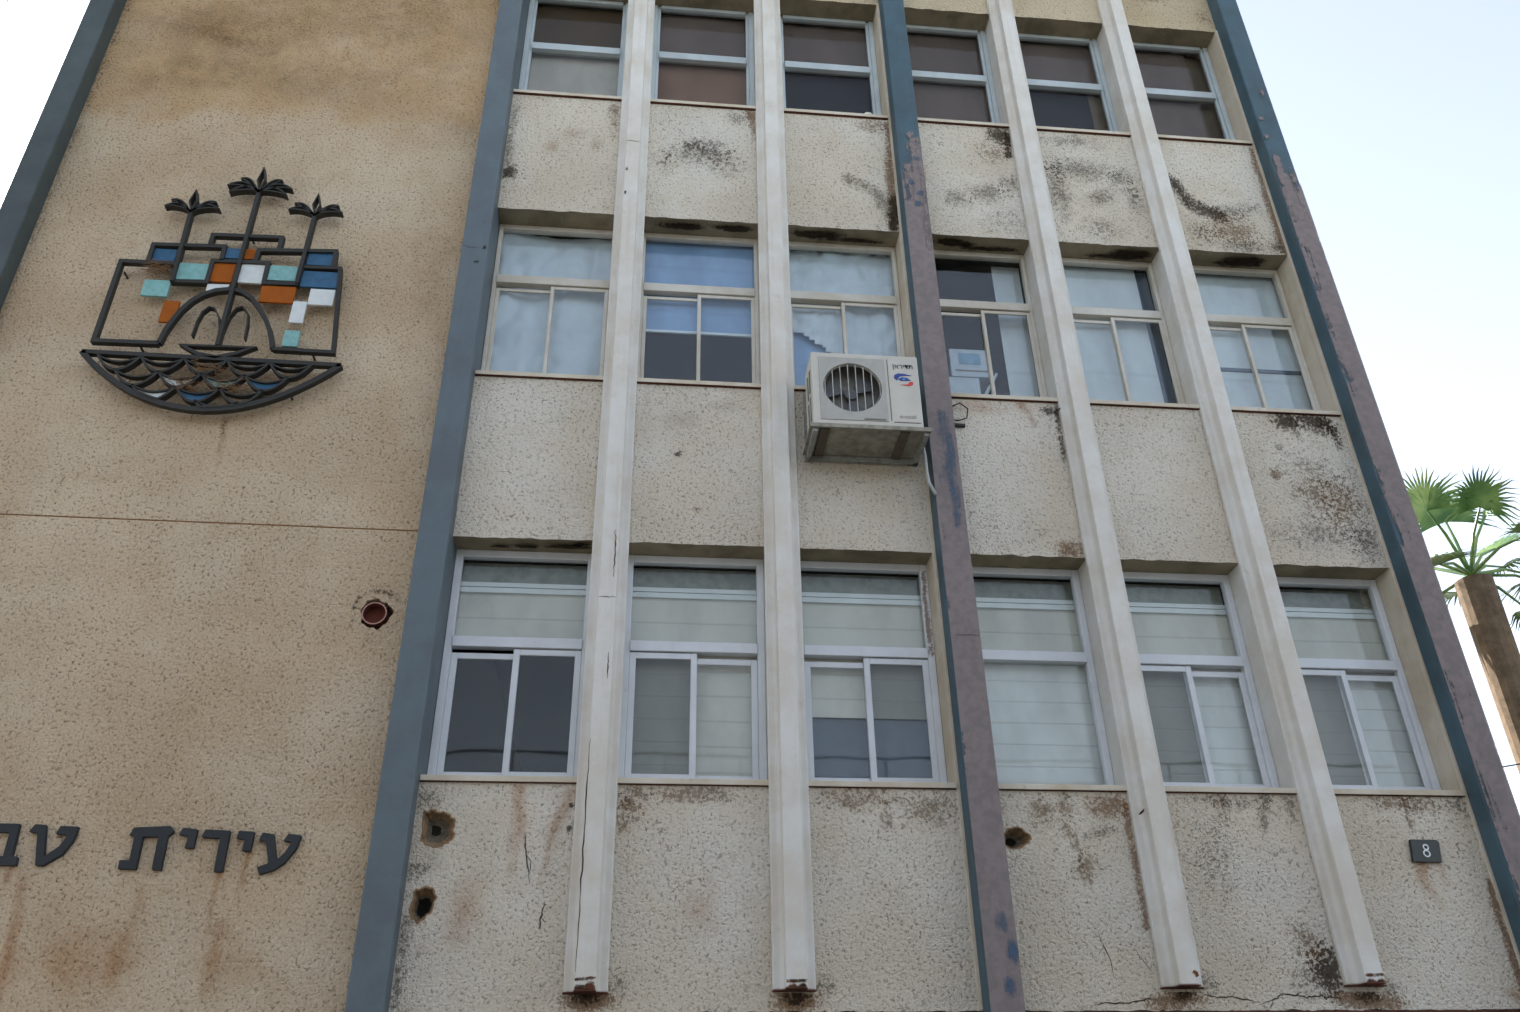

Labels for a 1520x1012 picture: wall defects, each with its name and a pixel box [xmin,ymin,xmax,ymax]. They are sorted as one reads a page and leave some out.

leakage [985,127,1012,159]
leakage [1169,175,1240,233]
mould [1268,414,1343,450]
peeling [901,131,1032,1012]
hole [420,809,456,848]
hole [409,886,437,925]